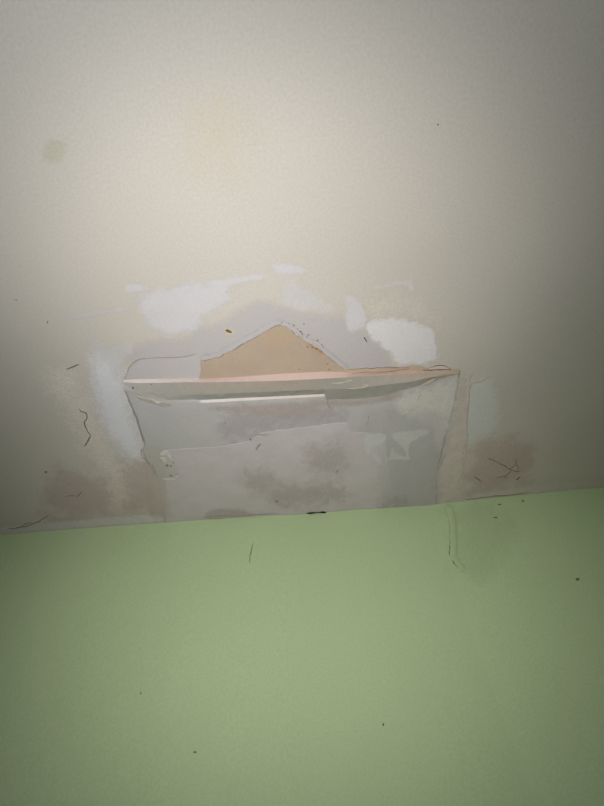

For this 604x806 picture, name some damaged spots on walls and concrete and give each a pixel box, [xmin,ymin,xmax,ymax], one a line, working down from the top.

peeling [198,319,349,379]
crack [79,409,91,446]
crack [474,458,521,483]